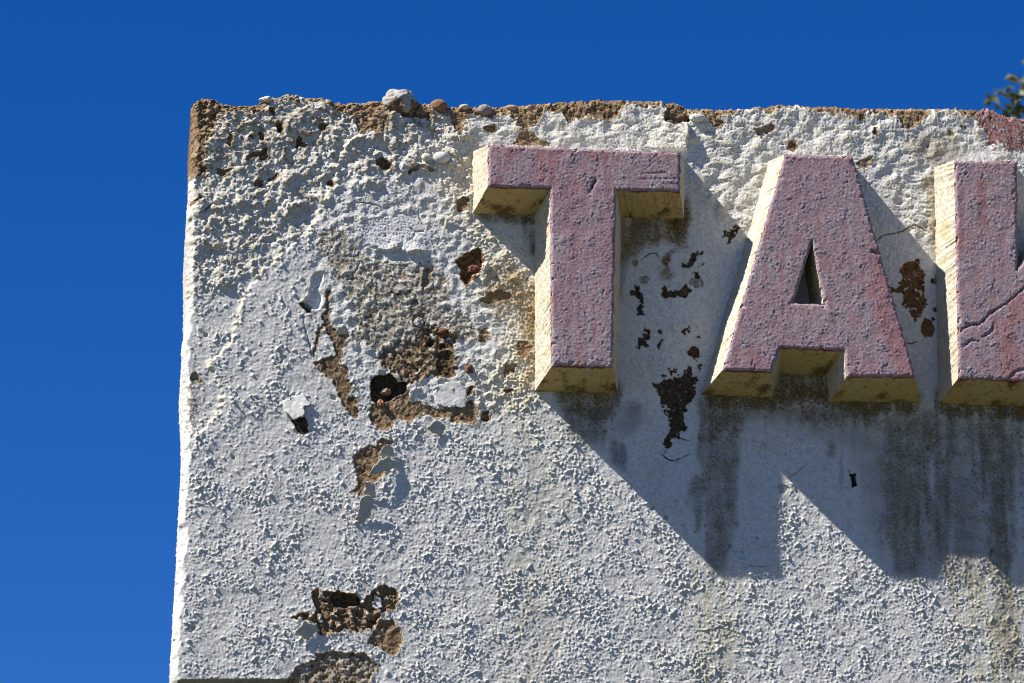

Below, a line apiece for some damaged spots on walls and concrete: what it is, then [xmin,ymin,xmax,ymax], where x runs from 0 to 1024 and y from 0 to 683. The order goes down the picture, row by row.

flaking render [331,99,736,147]
flaking render [754,106,777,139]
flaking render [805,106,930,135]
peeling [630,260,650,316]
peeling [635,328,663,349]
peeling [662,251,704,299]
peeling [890,259,937,337]
crack [959,290,1023,346]
peeling [282,393,311,435]
peeling [299,214,490,525]
peeling [652,326,702,448]
flaking render [287,585,403,683]